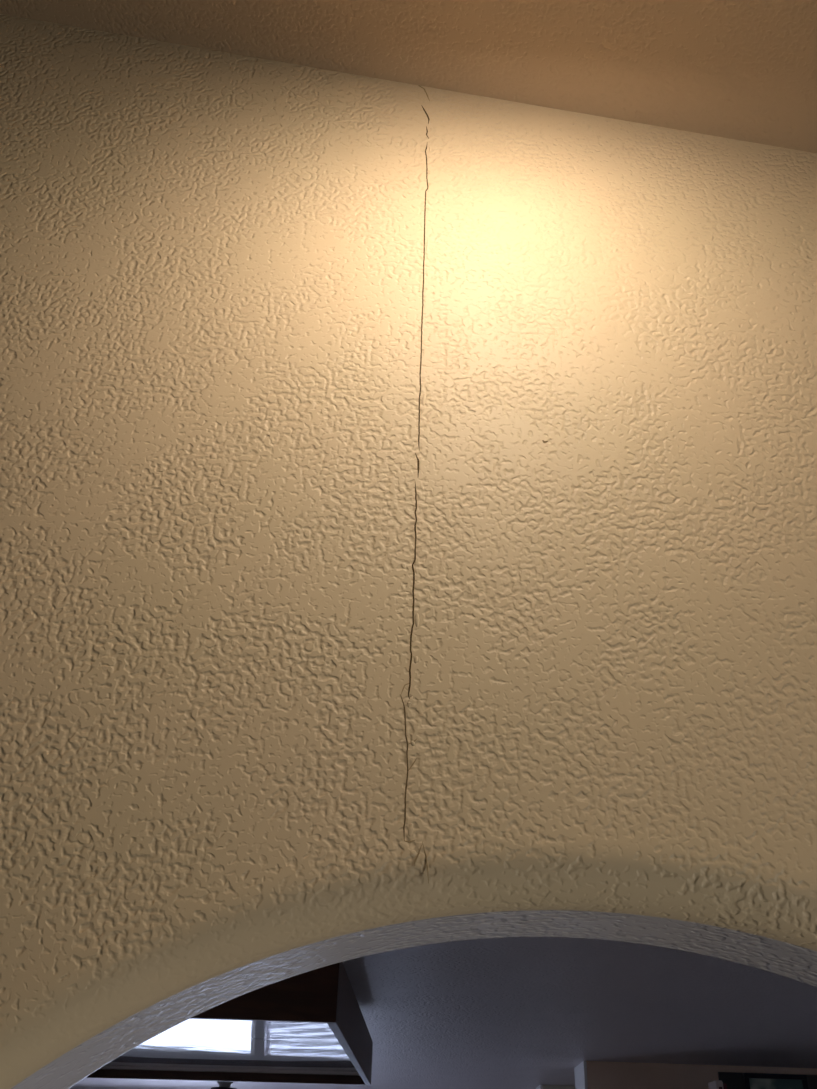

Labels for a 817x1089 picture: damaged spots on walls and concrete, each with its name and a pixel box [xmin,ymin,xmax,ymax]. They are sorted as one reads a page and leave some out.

crack [401,85,433,883]